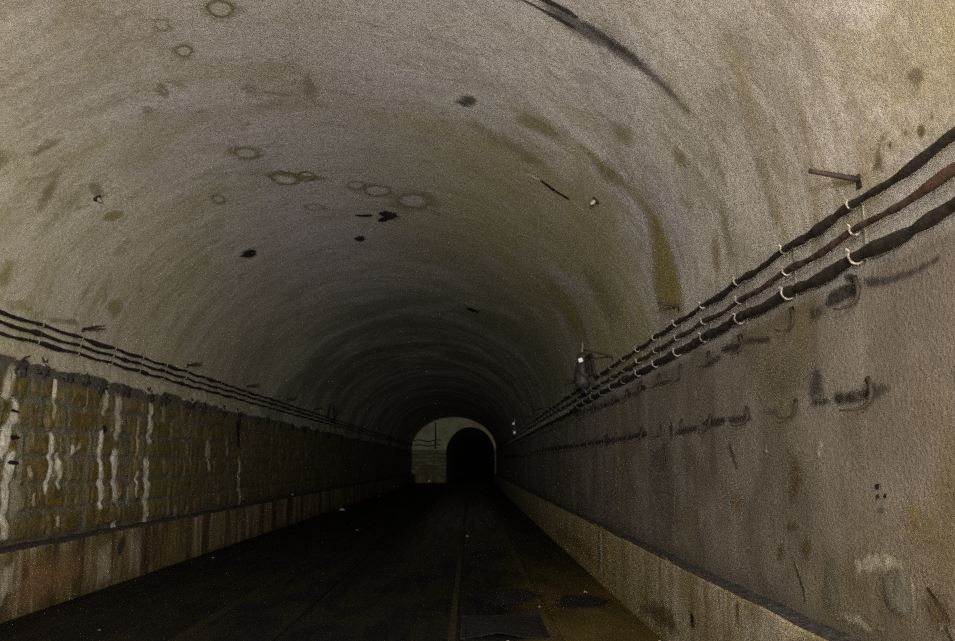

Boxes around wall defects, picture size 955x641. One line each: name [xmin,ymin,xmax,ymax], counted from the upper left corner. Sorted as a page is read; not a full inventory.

water stain [206,0,234,18]
water stain [265,171,324,185]
water stain [0,366,32,540]
water stain [31,432,81,512]
water stain [96,386,153,522]